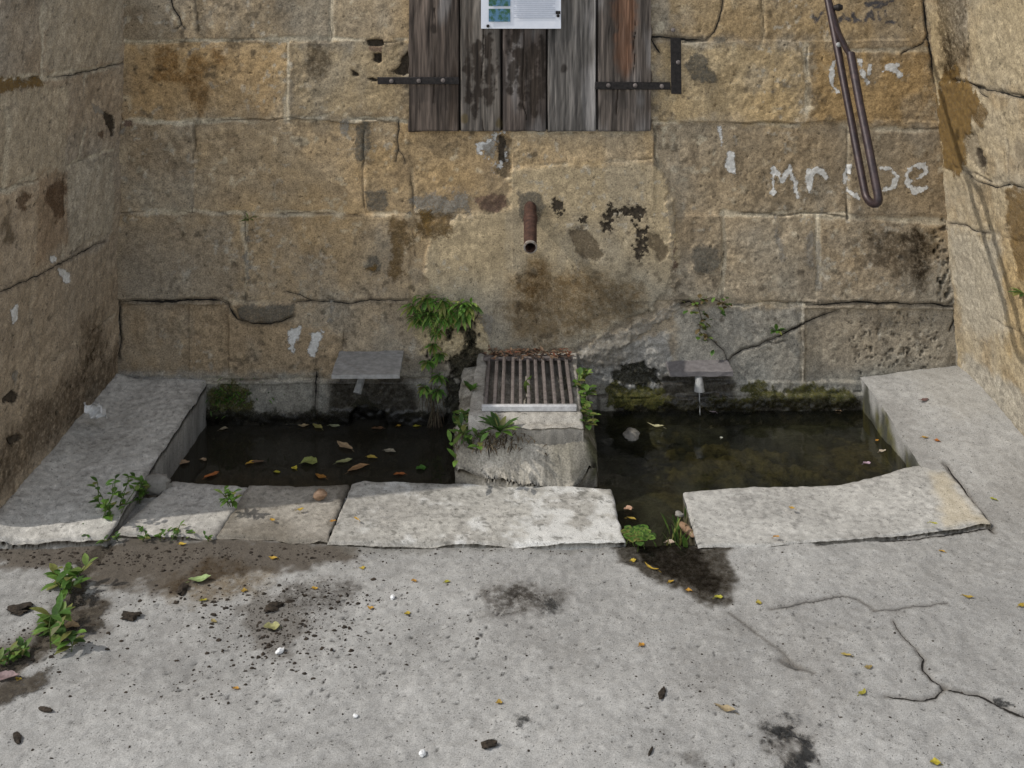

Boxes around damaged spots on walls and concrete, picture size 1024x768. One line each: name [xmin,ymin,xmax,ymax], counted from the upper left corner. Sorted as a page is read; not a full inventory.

spalling [483,135,511,177]
spalling [475,194,506,212]
crack [0,242,102,292]
crack [118,291,404,357]
crack [706,301,954,360]
damp [616,545,736,604]
crack [733,616,810,672]
crack [774,596,1024,718]
damp [761,712,819,768]